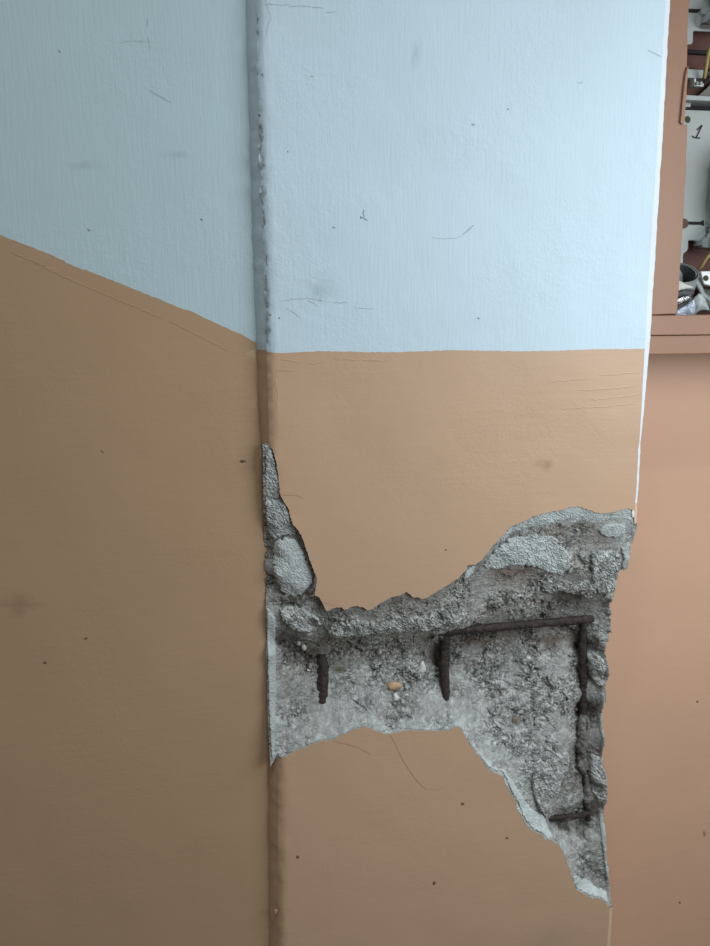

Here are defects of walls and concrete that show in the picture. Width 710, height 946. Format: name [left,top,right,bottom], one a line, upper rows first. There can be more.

spalling [262,443,637,911]